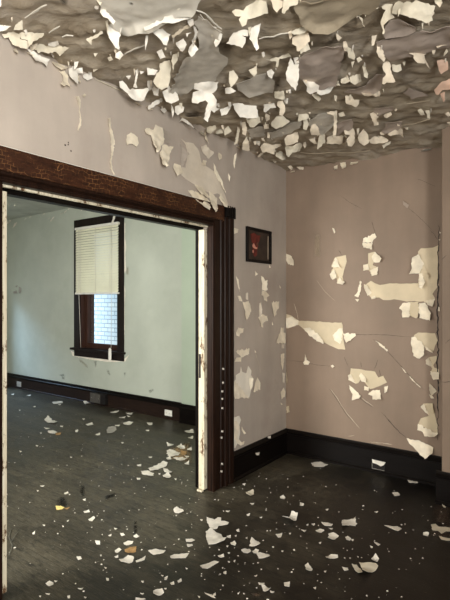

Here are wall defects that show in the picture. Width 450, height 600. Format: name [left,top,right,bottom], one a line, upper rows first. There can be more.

peeling [0,0,450,212]
peeling [236,277,251,319]
peeling [255,271,279,327]
peeling [330,251,347,285]
peeling [355,223,439,321]
crack [403,201,450,439]
peeling [234,348,260,399]
peeling [348,360,388,407]
crack [376,341,422,388]
peeling [388,333,439,459]